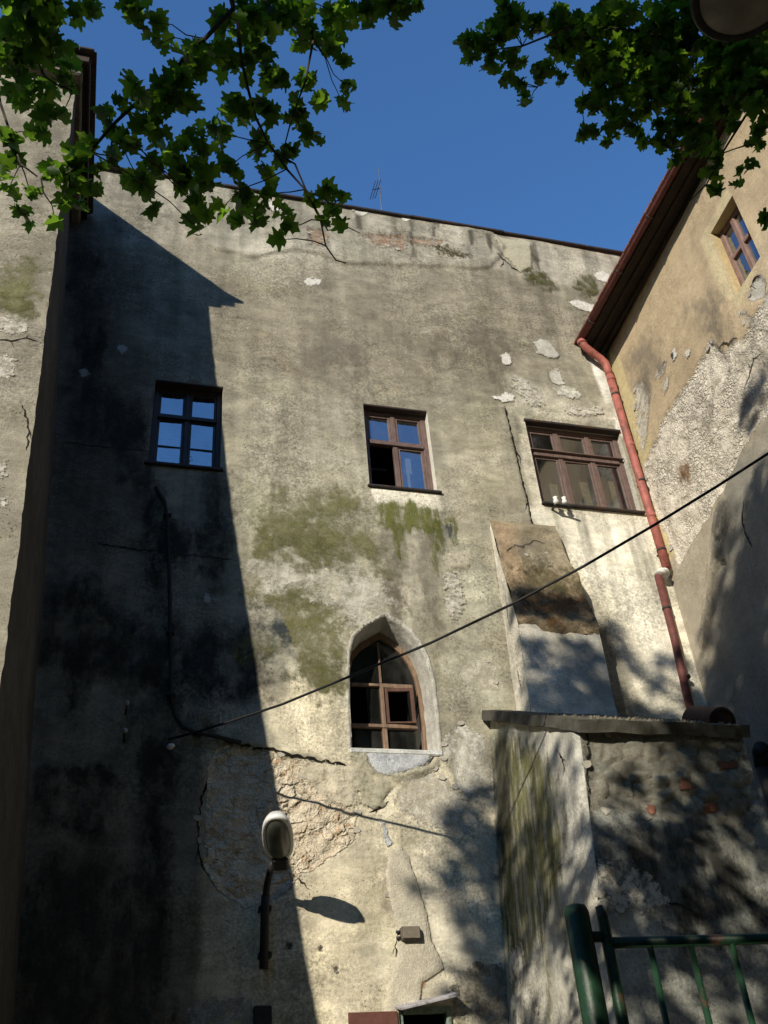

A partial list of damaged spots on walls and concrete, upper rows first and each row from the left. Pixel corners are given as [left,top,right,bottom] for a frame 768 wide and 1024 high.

flaking render [304,277,322,287]
flaking render [492,352,545,406]
flaking render [548,368,604,417]
flaking render [633,274,768,565]
crack [505,408,542,552]
water stain [249,523,404,628]
crack [224,741,345,765]
flaking render [193,720,495,908]
water stain [493,746,509,852]